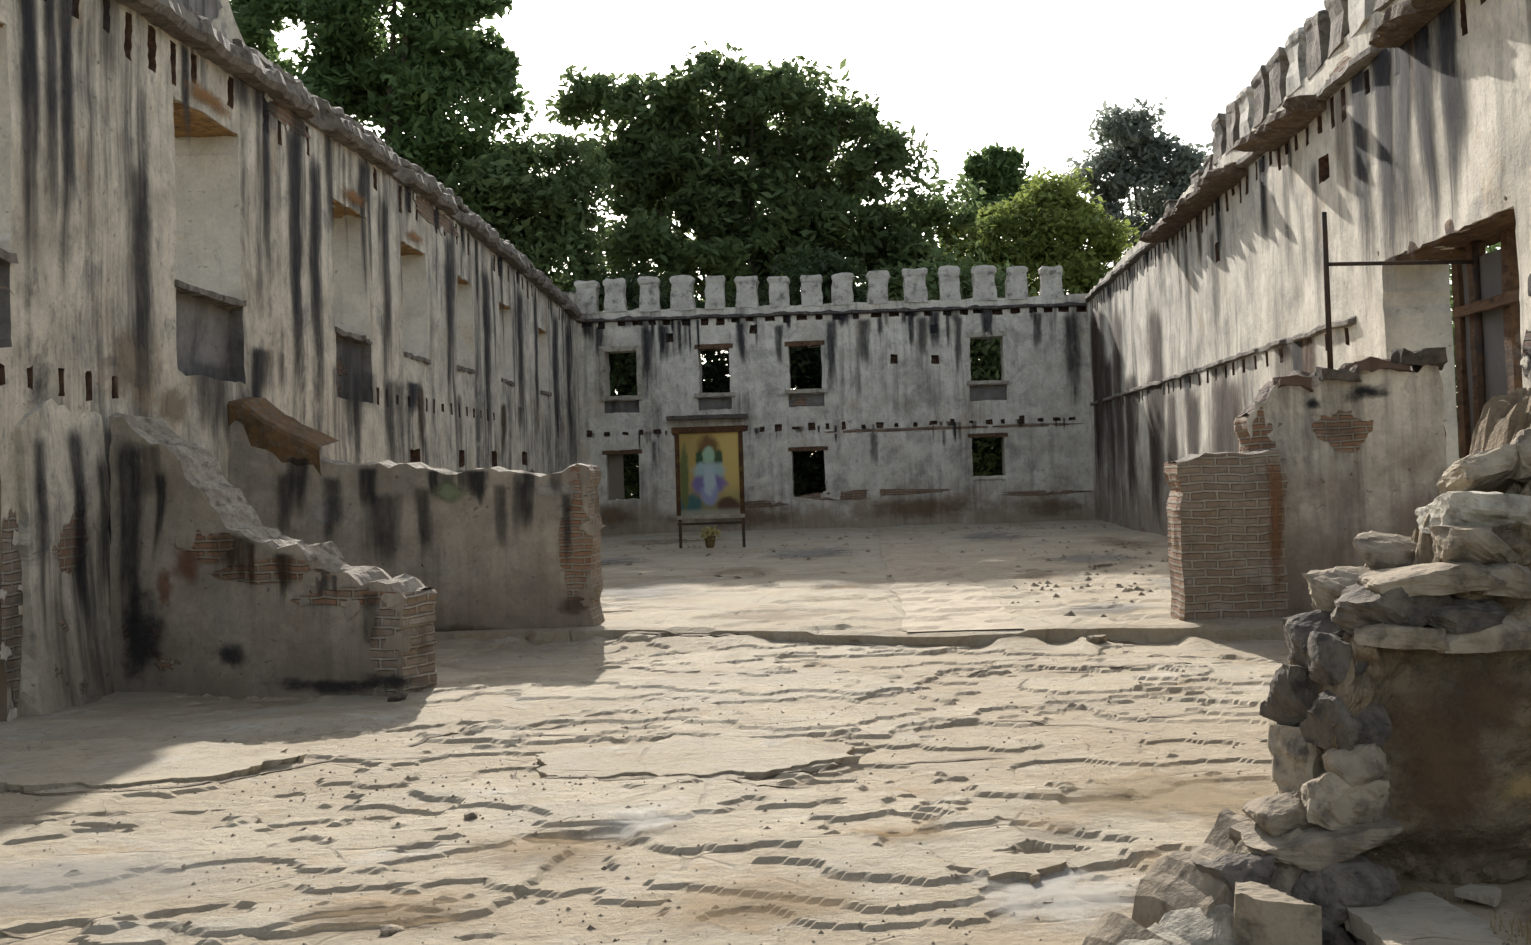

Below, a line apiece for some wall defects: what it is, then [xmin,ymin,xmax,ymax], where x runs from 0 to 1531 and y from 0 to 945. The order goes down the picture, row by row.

damp [21,0,74,242]
damp [1350,1,1463,278]
damp [290,133,333,374]
damp [359,159,392,345]
damp [434,206,604,465]
damp [902,312,961,364]
spalling [175,521,412,697]
spalling [555,463,606,607]
crack [602,572,856,644]
crack [858,636,1025,678]
crack [1064,638,1223,672]
crack [7,705,1252,816]